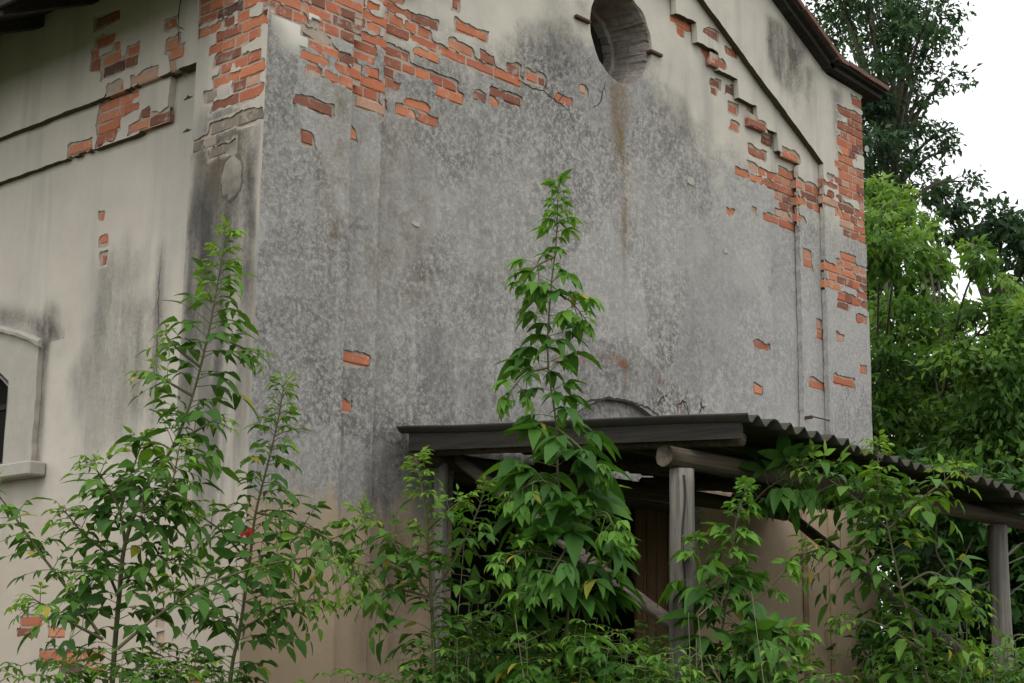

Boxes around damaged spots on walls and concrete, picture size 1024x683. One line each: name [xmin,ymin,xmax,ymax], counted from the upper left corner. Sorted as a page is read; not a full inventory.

spalling [68,10,185,158]
spalling [193,0,588,161]
crack [519,80,565,108]
spalling [670,15,869,244]
spalling [99,234,109,267]
spalling [802,249,867,324]